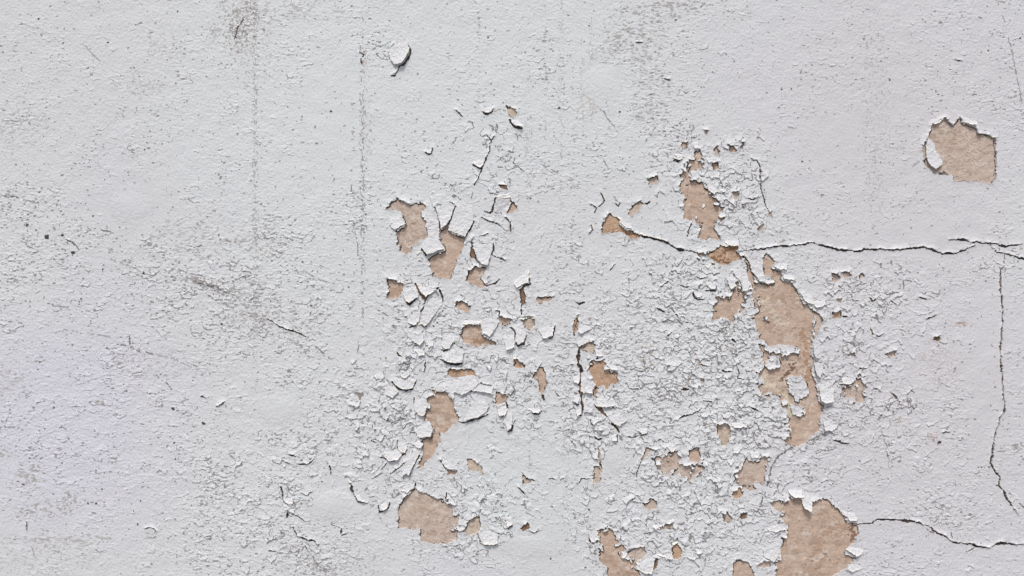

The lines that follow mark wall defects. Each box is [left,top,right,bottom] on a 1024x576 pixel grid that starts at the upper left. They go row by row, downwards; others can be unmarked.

peeling [375,35,409,74]
peeling [472,101,522,216]
peeling [918,116,1020,184]
peeling [122,198,344,390]
peeling [170,119,932,576]
crack [738,238,1024,520]
peeling [42,427,119,495]
crack [851,518,1015,552]